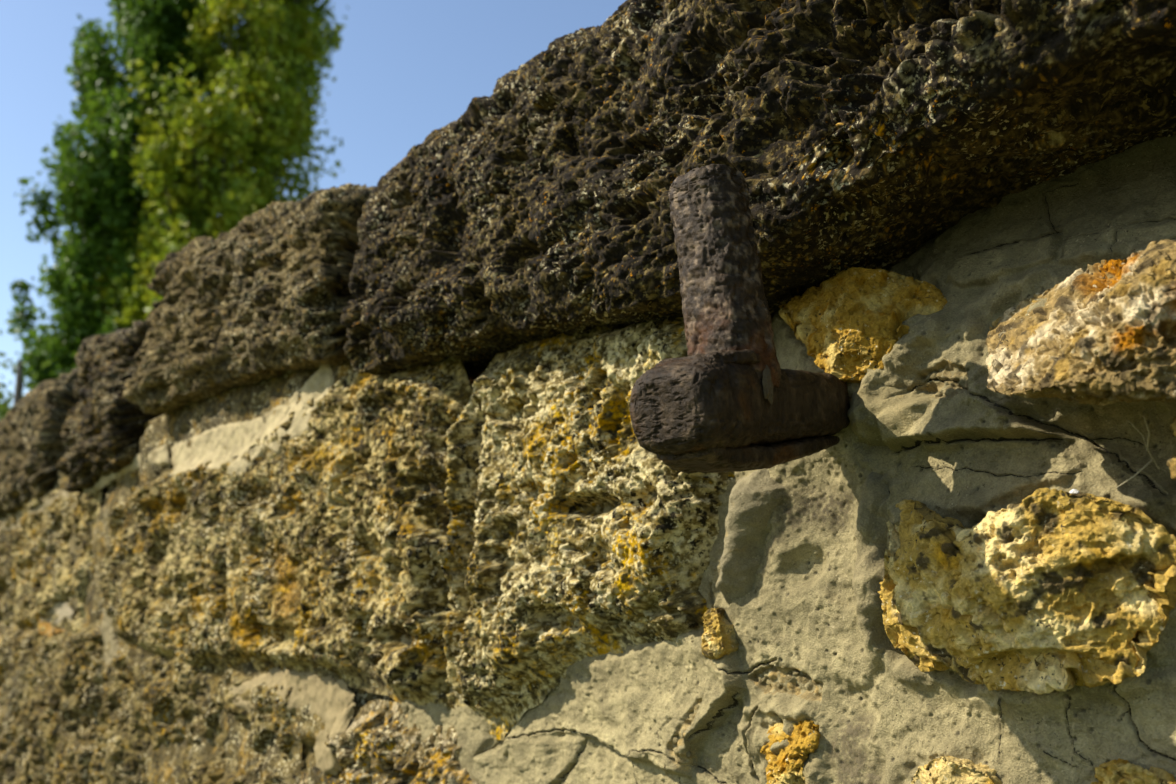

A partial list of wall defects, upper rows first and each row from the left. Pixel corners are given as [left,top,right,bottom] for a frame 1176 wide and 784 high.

crack [896,378,1165,495]
crack [490,659,777,784]